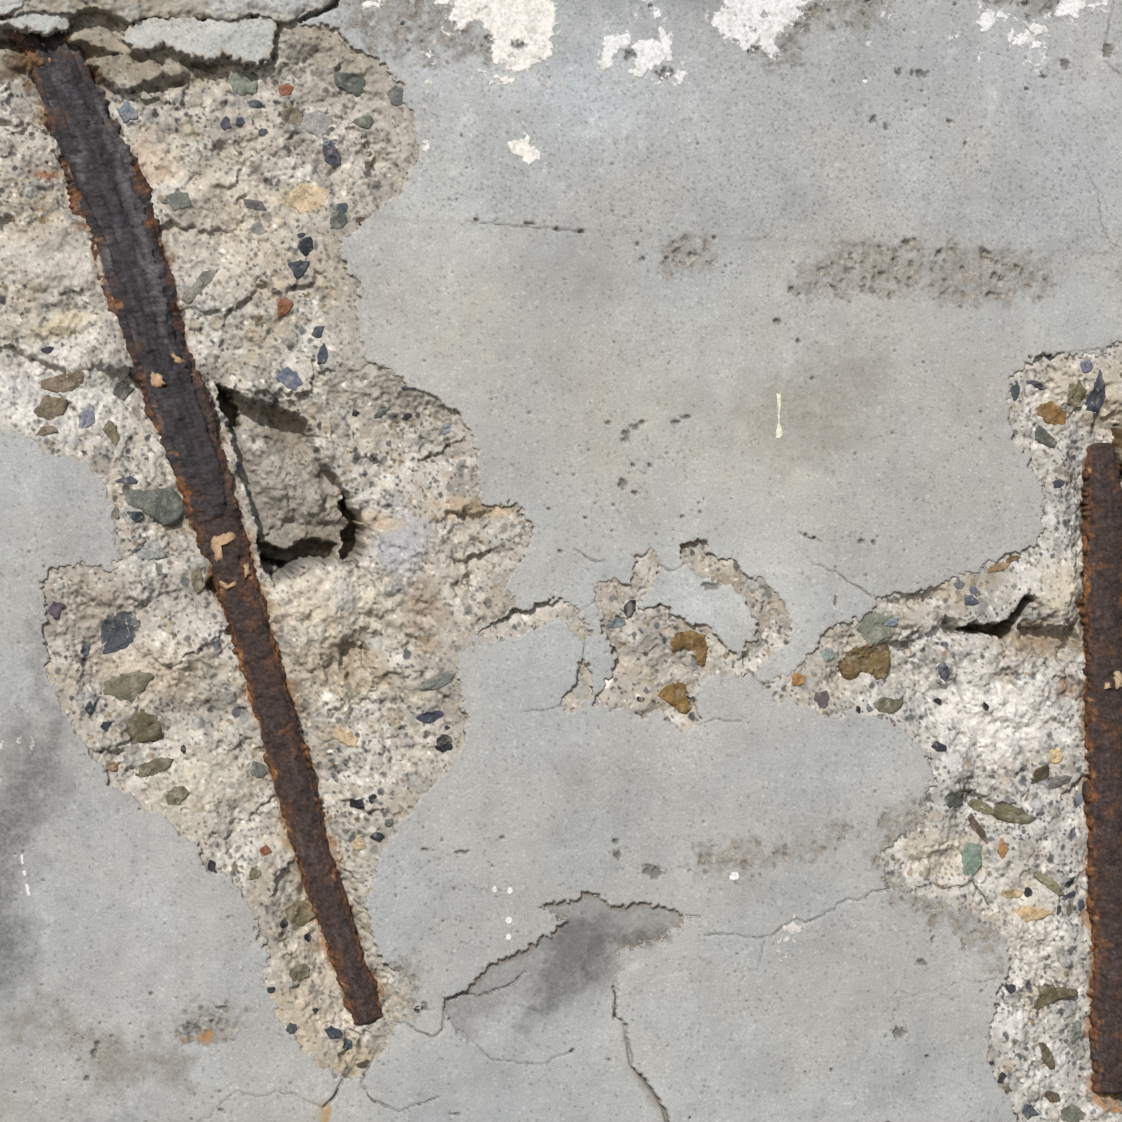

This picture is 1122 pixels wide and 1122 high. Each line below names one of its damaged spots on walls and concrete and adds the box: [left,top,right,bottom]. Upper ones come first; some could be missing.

crack [297,0,338,24]
peeling [705,0,895,67]
peeling [976,0,1112,75]
spalling [0,0,793,1078]
spalling [762,341,1122,1122]
crack [398,976,520,1037]
crack [610,989,618,1016]
crack [326,1038,435,1109]
corrosion [1089,1069,1122,1113]